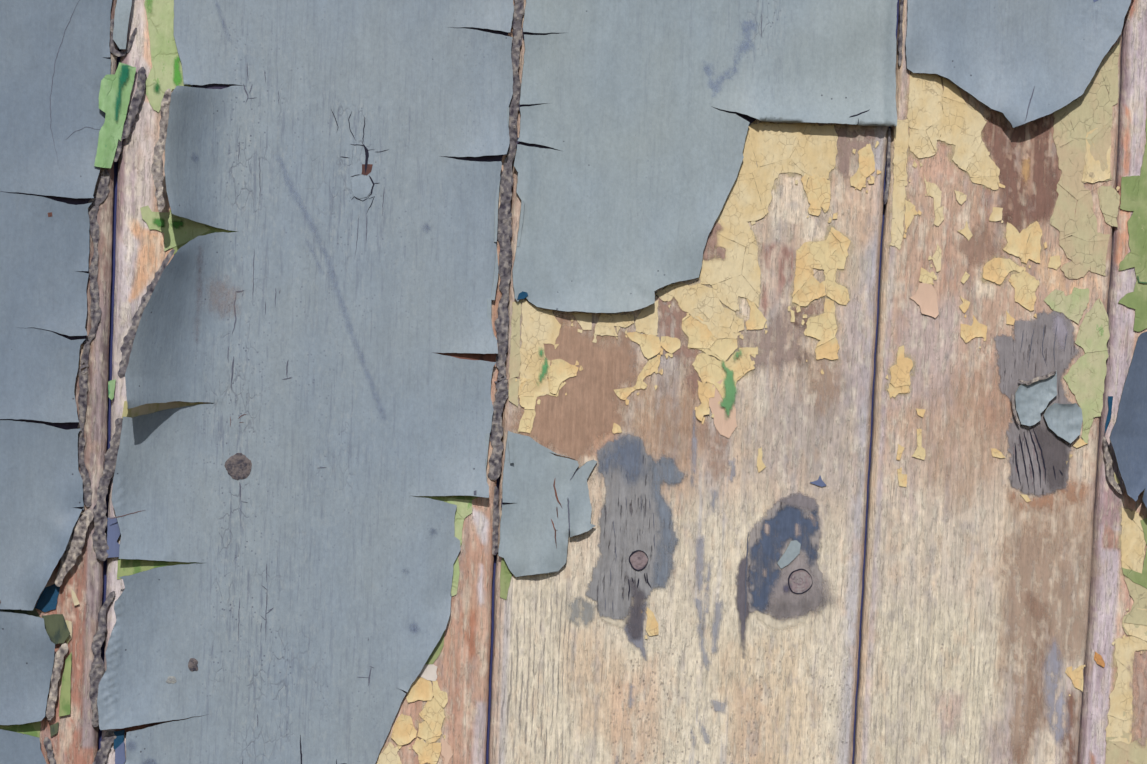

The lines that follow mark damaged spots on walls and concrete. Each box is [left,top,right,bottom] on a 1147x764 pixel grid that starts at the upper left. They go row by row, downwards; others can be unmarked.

peeling [0,0,514,764]
peeling [642,608,659,639]
peeling [498,0,1131,577]
peeling [1065,331,1147,764]